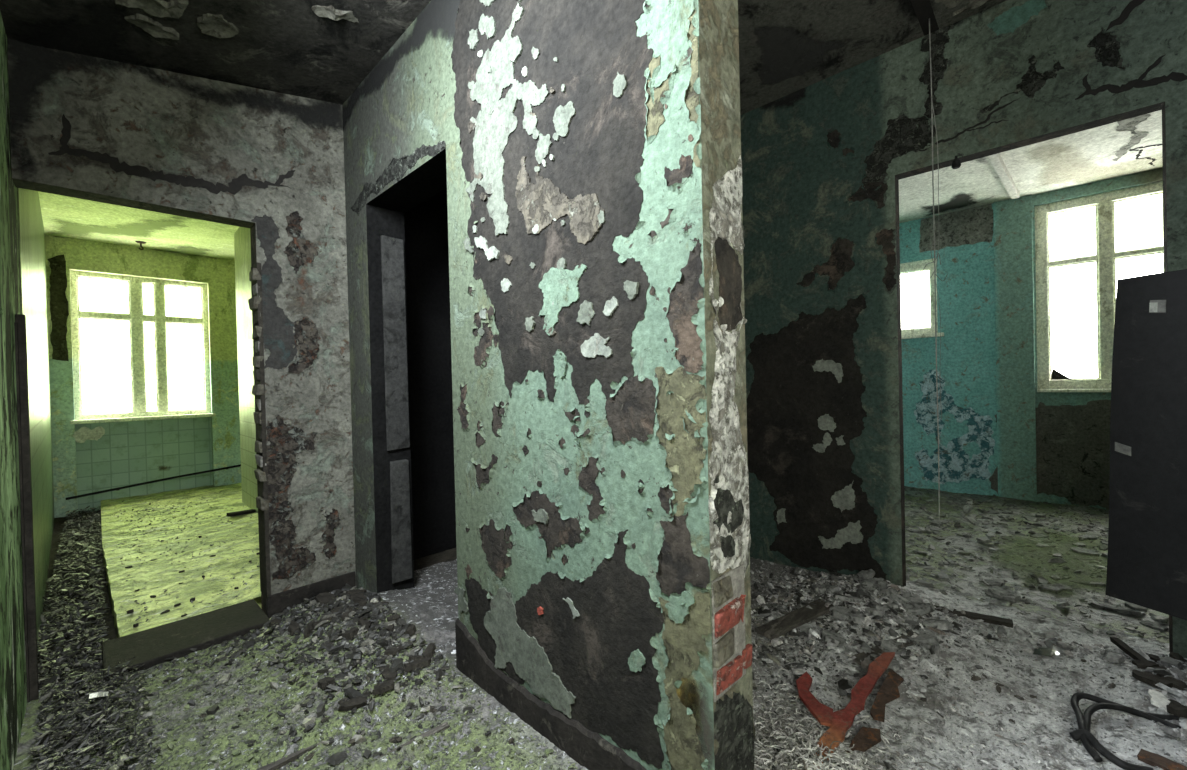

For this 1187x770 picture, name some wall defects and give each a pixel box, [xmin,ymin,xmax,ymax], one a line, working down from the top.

peeling [115,0,188,40]
peeling [197,13,239,38]
peeling [311,5,359,22]
crack [1105,0,1145,32]
peeling [846,0,988,209]
crack [1075,54,1187,100]
crack [48,114,296,195]
peeling [248,211,342,598]
peeling [351,0,889,770]
peeling [913,369,1007,498]
peeling [1035,399,1111,510]